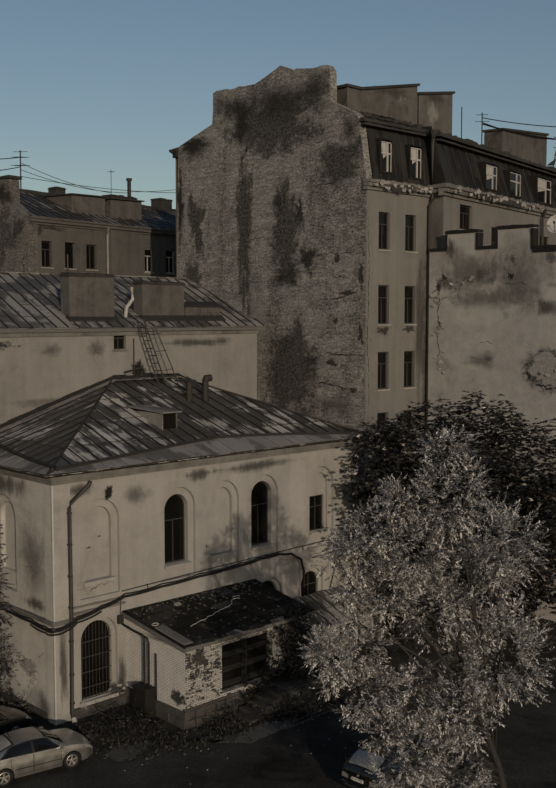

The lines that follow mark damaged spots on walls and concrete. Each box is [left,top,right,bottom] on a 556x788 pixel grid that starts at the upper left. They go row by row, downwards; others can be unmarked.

water stain [276,247,316,285]
crack [432,277,470,360]
flaking render [187,648,209,667]